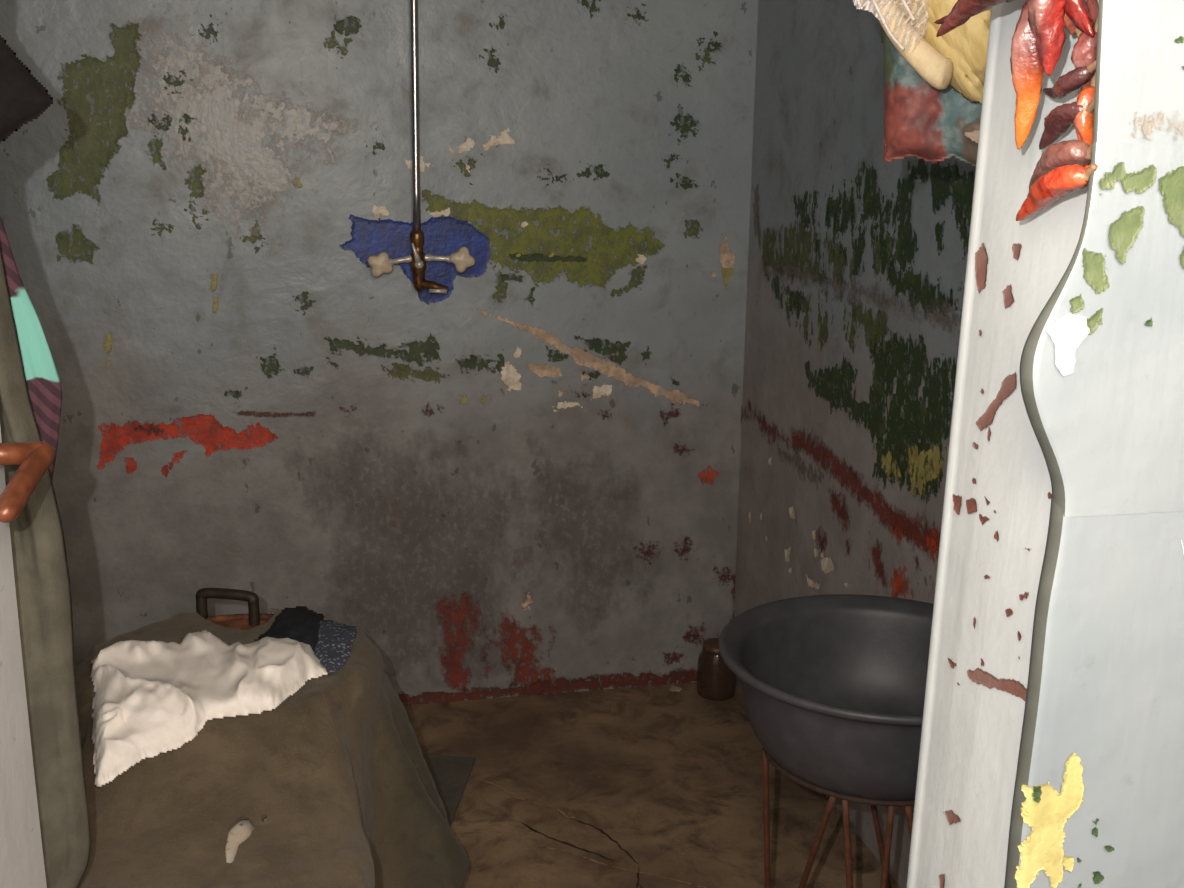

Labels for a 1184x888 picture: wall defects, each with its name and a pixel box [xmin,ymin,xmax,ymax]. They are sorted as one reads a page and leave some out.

peeling [46,23,141,205]
peeling [147,114,194,170]
peeling [664,104,702,190]
peeling [56,224,100,264]
peeling [324,190,700,427]
peeling [753,159,975,503]
peeling [1045,162,1184,376]
peeling [97,387,315,477]
crack [519,819,707,888]
peeling [1015,752,1085,888]
peeling [1079,871,1104,887]
peeling [1092,819,1119,852]